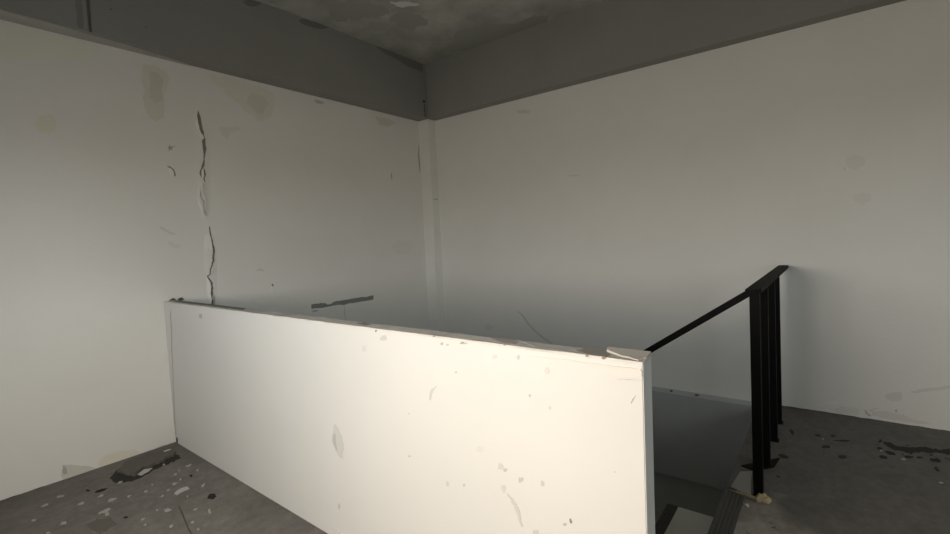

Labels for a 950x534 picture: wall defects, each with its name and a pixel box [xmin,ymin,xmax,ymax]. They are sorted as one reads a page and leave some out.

crack [197,111,215,304]
flaking render [311,295,373,309]